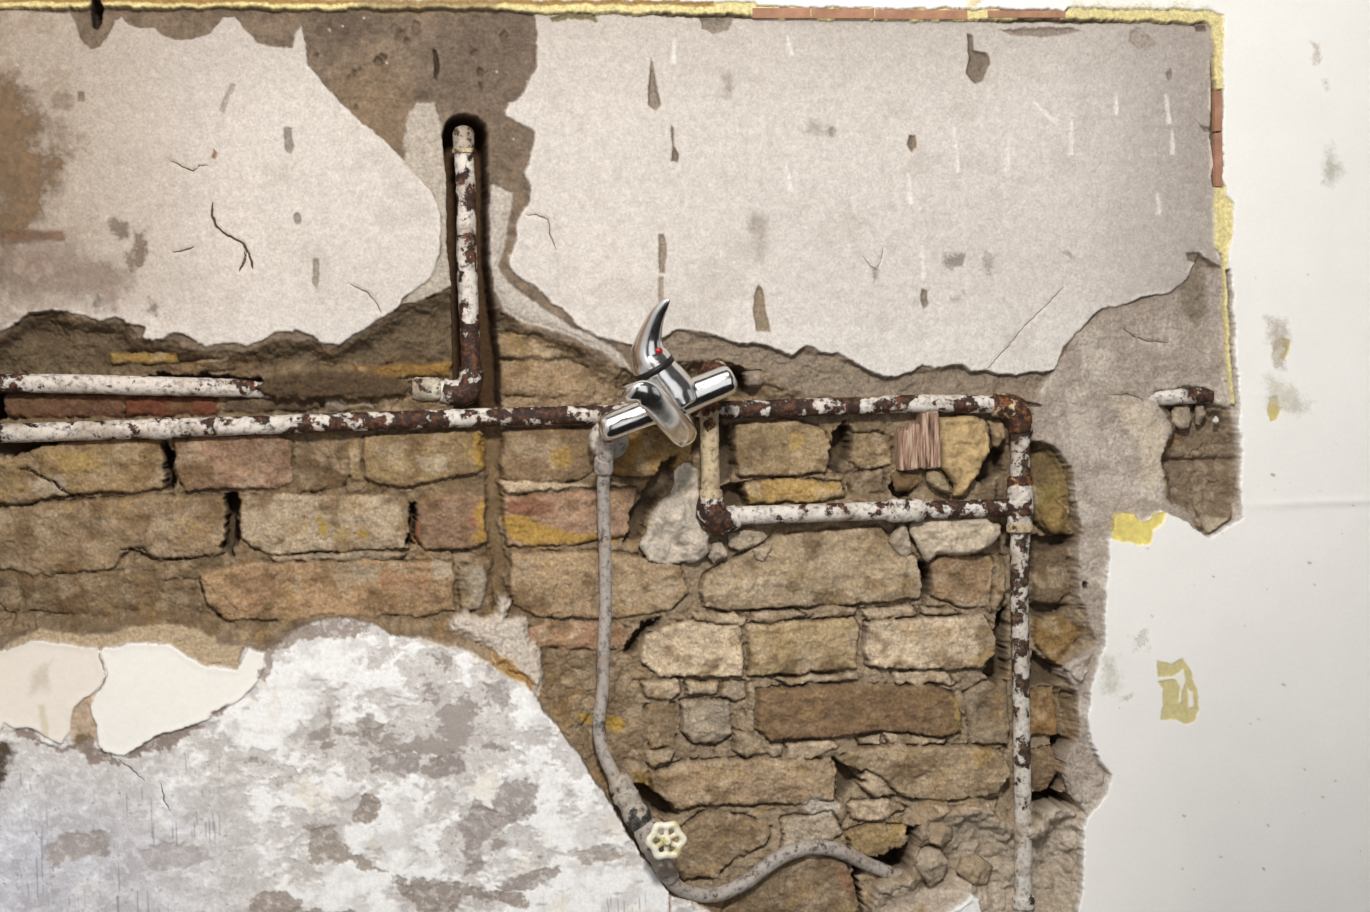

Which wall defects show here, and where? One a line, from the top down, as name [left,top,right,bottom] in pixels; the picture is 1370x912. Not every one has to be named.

crack [174,202,253,272]
flaking render [0,7,1225,424]
flaking render [0,412,1015,912]
flaking render [1028,252,1244,827]